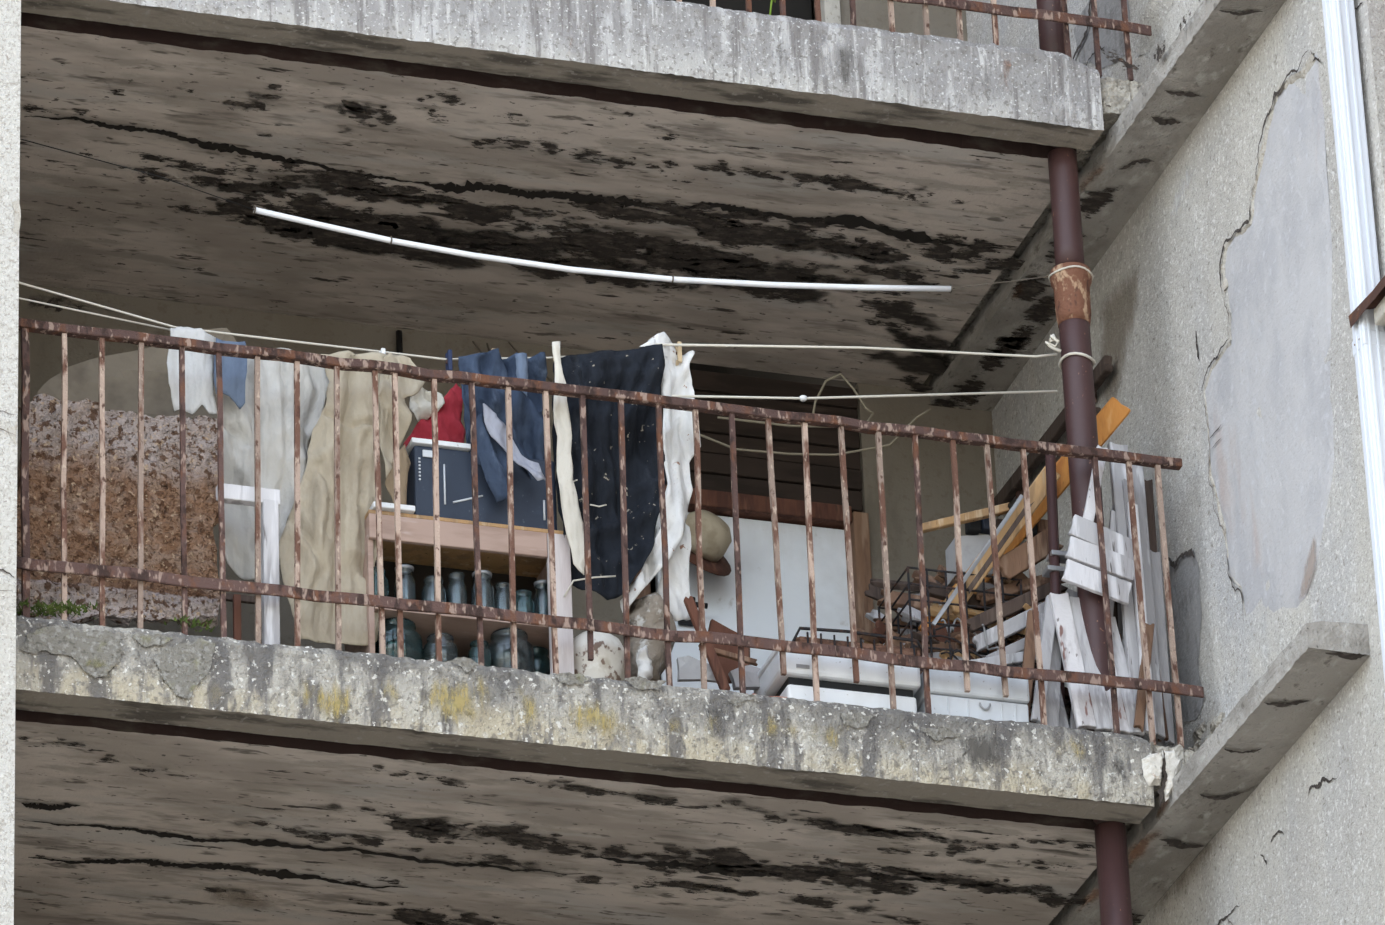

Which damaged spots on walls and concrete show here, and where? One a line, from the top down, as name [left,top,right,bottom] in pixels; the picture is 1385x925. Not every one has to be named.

crack [1196,50,1321,610]
water stain [967,735,998,764]
peeling [1142,548,1225,806]
crack [1217,905,1238,925]